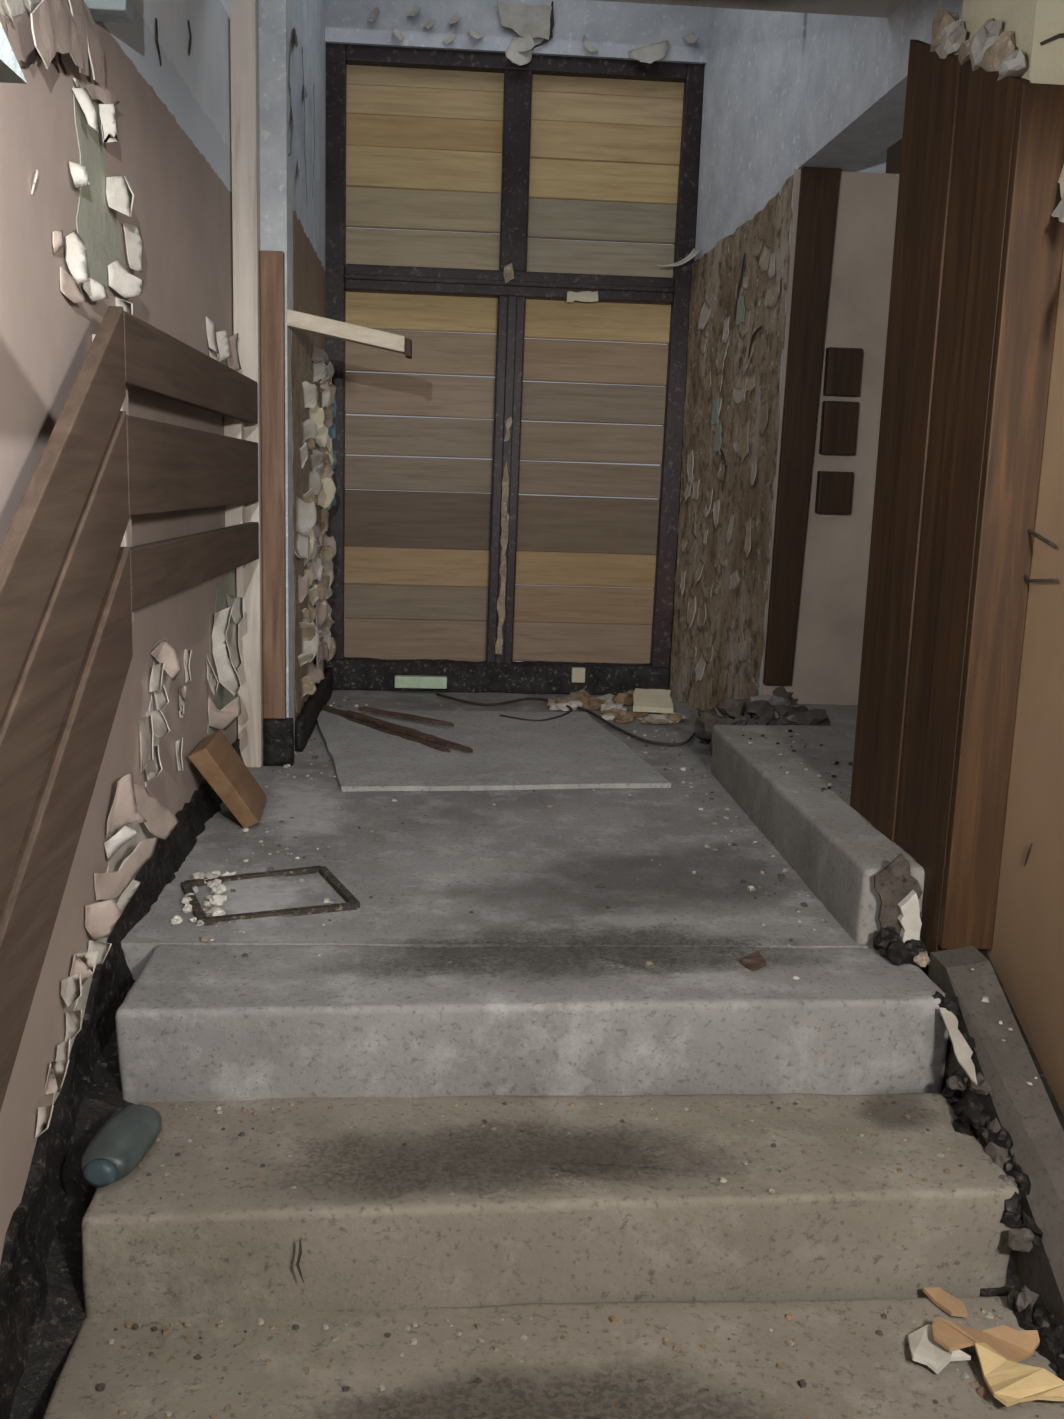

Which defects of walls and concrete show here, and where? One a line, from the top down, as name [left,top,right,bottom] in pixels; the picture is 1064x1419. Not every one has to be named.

peeling [497,1,554,66]
peeling [628,32,699,64]
spalling [930,9,1027,81]
peeling [0,0,144,315]
peeling [1051,166,1064,222]
peeling [657,175,794,711]
peeling [290,328,337,714]
peeling [35,570,244,1138]
spalling [873,853,930,967]